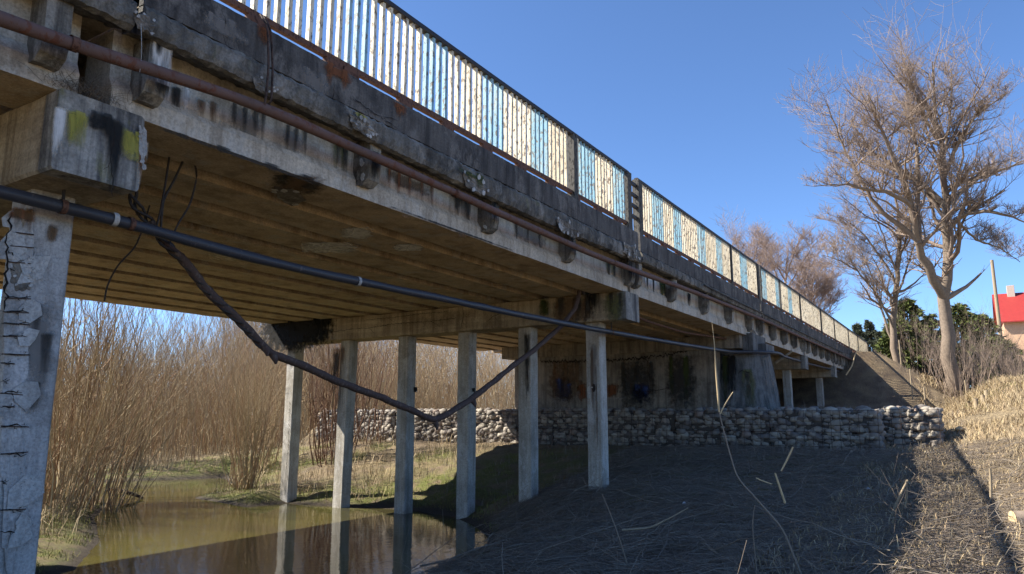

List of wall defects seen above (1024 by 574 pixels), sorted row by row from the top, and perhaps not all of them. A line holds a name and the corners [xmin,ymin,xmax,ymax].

water stain [153,41,171,66]
water stain [157,81,266,136]
water stain [284,125,307,151]
crack [0,213,31,535]
spalling [0,211,51,574]
water stain [621,355,696,408]